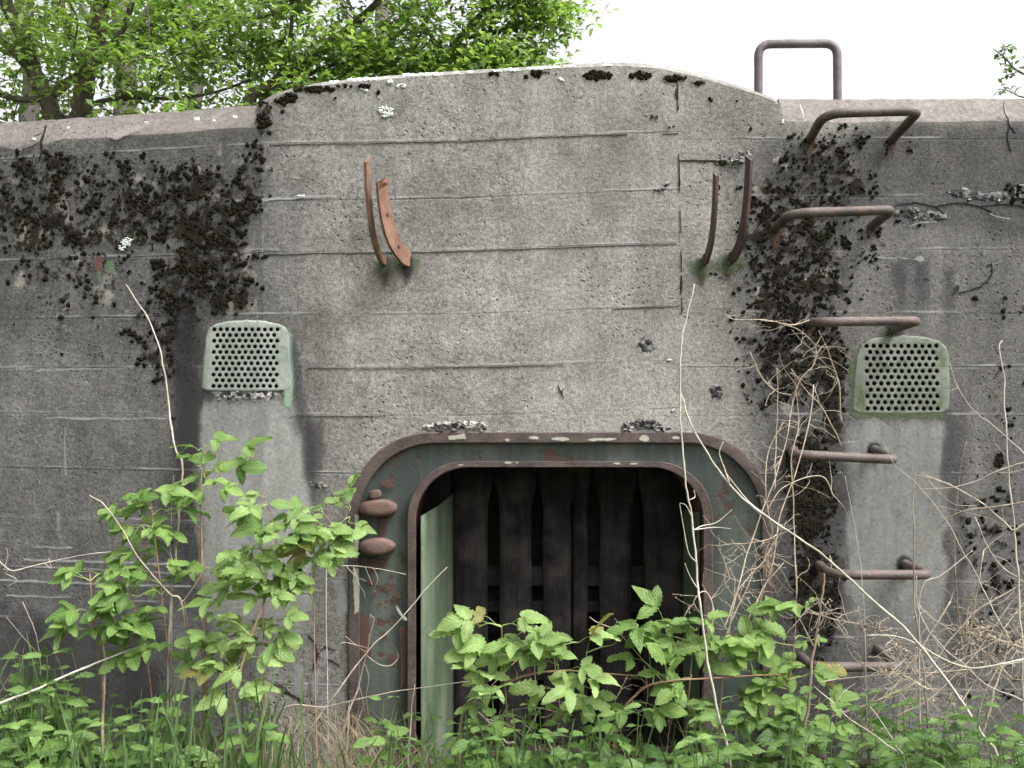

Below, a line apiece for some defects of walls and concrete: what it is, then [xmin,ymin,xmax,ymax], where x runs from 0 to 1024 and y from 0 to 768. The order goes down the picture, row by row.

damp [196,401,314,623]
rust [378,516,388,538]
damp [846,412,948,629]
damp [24,546,105,563]
damp [334,580,348,614]
rust [363,557,401,607]
rust [360,613,407,689]